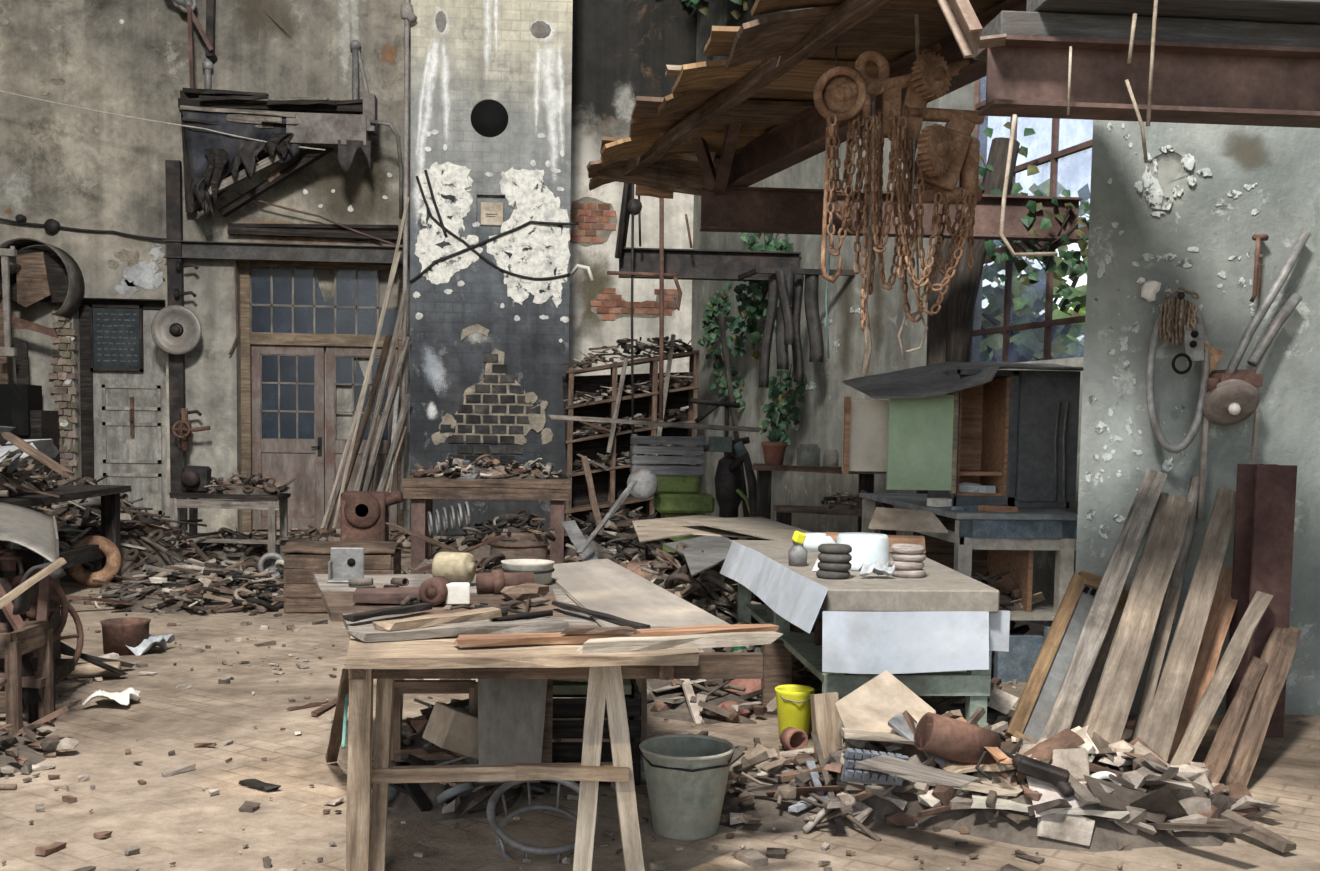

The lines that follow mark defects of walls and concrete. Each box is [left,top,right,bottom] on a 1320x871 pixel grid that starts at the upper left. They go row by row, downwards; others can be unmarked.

water stain [485,0,498,62]
water stain [414,11,449,209]
water stain [530,21,564,167]
peeling [413,129,618,323]
spalling [1099,122,1212,217]
spalling [590,288,679,320]
spalling [431,348,553,464]